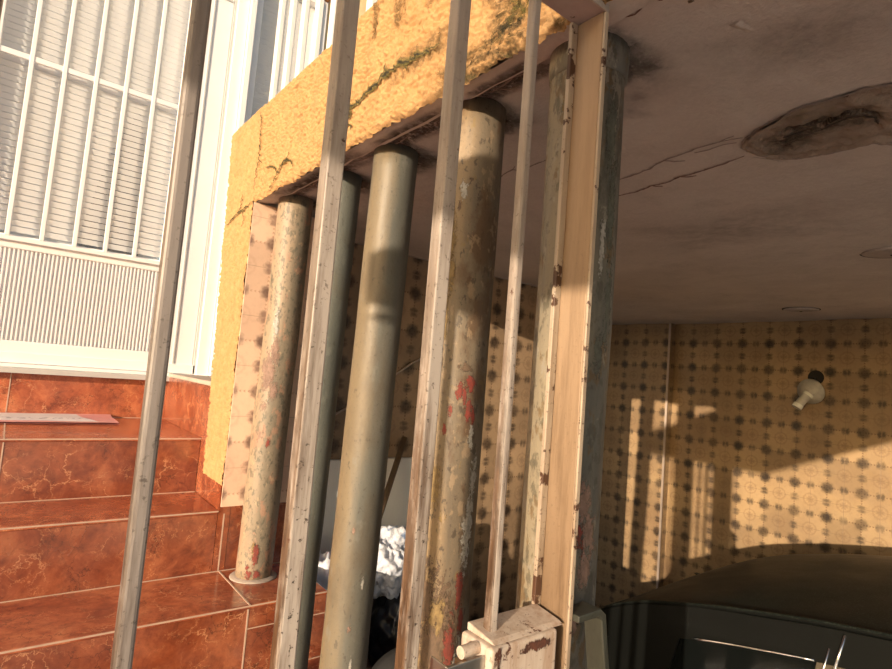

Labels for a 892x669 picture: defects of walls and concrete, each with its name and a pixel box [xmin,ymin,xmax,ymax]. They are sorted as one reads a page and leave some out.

damp [465,0,525,99]
damp [288,172,319,210]
damp [382,115,441,168]
crack [619,136,744,196]
spalling [740,84,892,161]
peeling [444,178,474,338]
peeling [417,362,478,669]